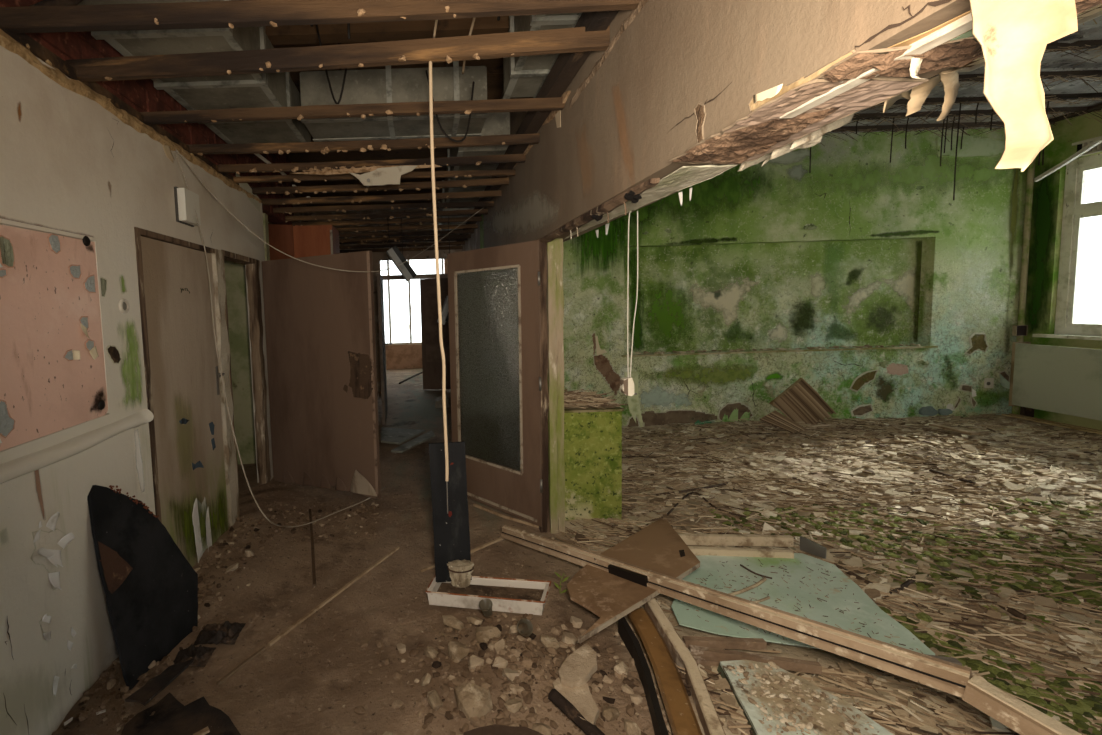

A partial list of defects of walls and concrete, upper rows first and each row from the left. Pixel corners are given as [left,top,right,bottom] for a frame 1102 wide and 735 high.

spalling [1053,32,1087,43]
flaking render [1075,0,1102,15]
flaking render [0,29,261,212]
flaking render [565,36,984,239]
efflorescence [769,149,810,180]
flaking render [935,134,1005,159]
damp [1010,168,1020,267]
spalling [63,316,122,364]
damp [629,250,757,350]
damp [769,275,825,342]
damp [826,268,916,339]
flaking render [964,332,989,356]